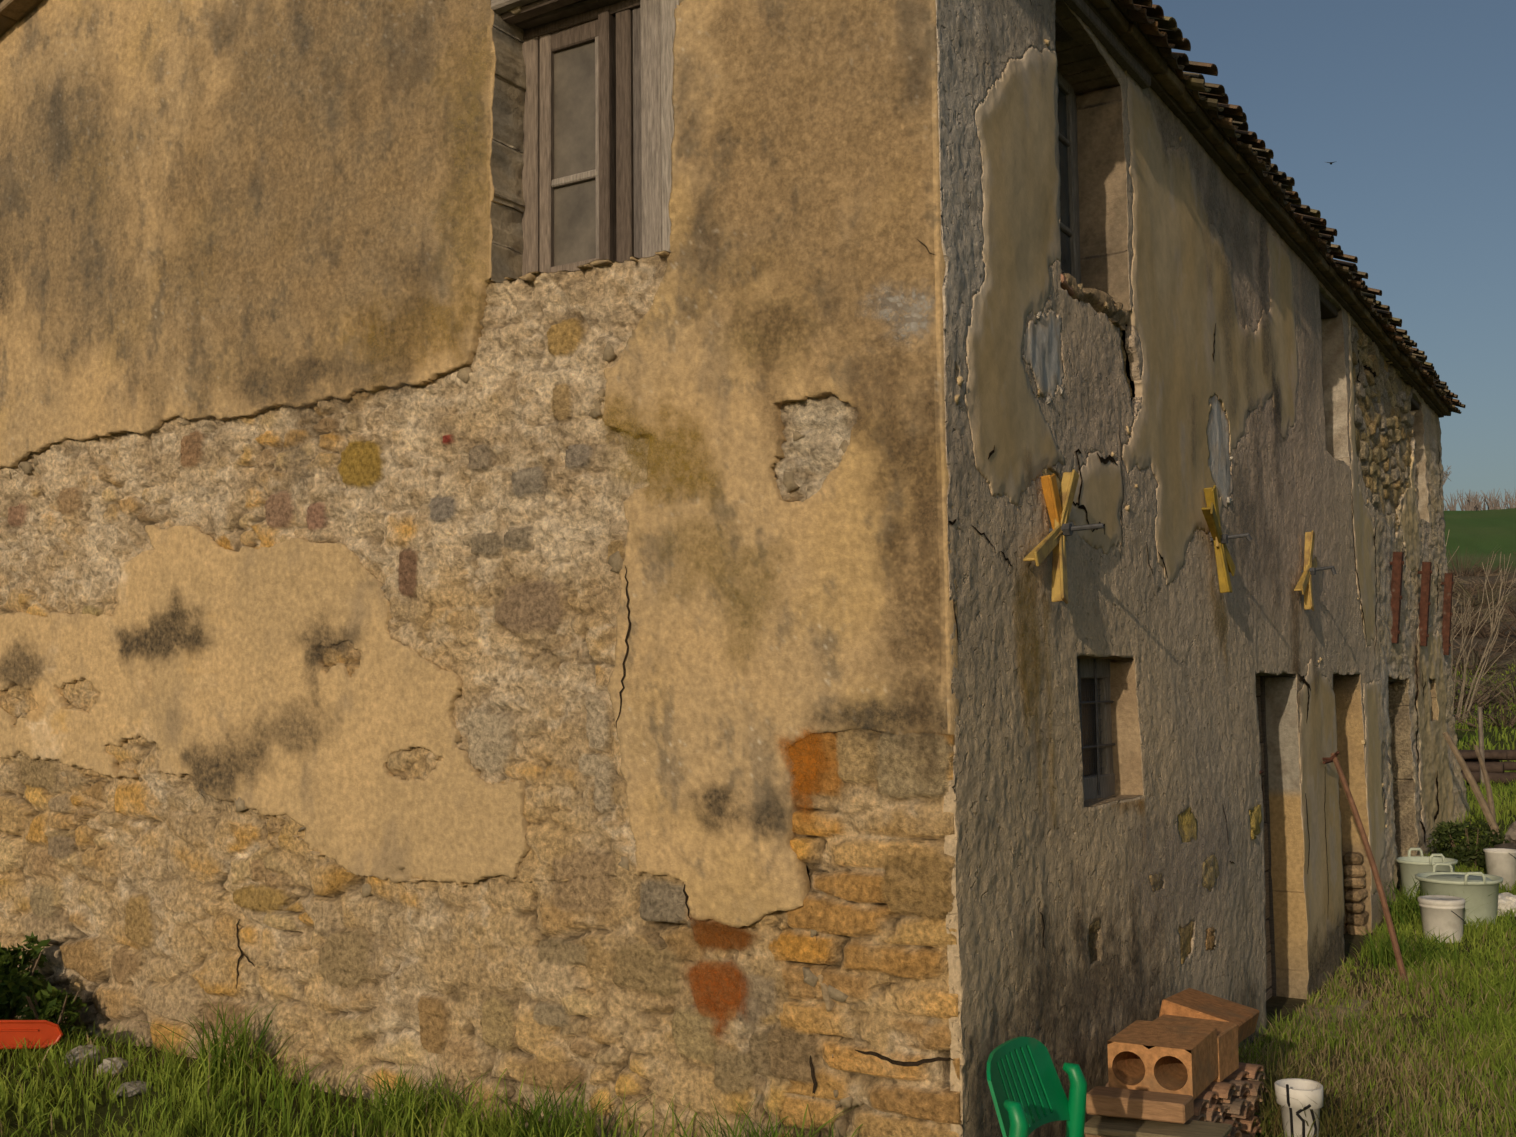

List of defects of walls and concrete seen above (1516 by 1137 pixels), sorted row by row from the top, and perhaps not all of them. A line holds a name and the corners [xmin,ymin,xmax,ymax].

peeling [955,39,1298,585]
flaking render [1351,320,1422,572]
crack [1073,425,1168,578]
damp [119,599,203,656]
crack [616,566,631,728]
flaking render [0,255,961,1137]
damp [823,685,947,736]
damp [184,754,235,795]
damp [704,790,729,827]
corrosion [781,731,823,810]
crack [809,1055,817,1098]
crack [855,1049,953,1066]